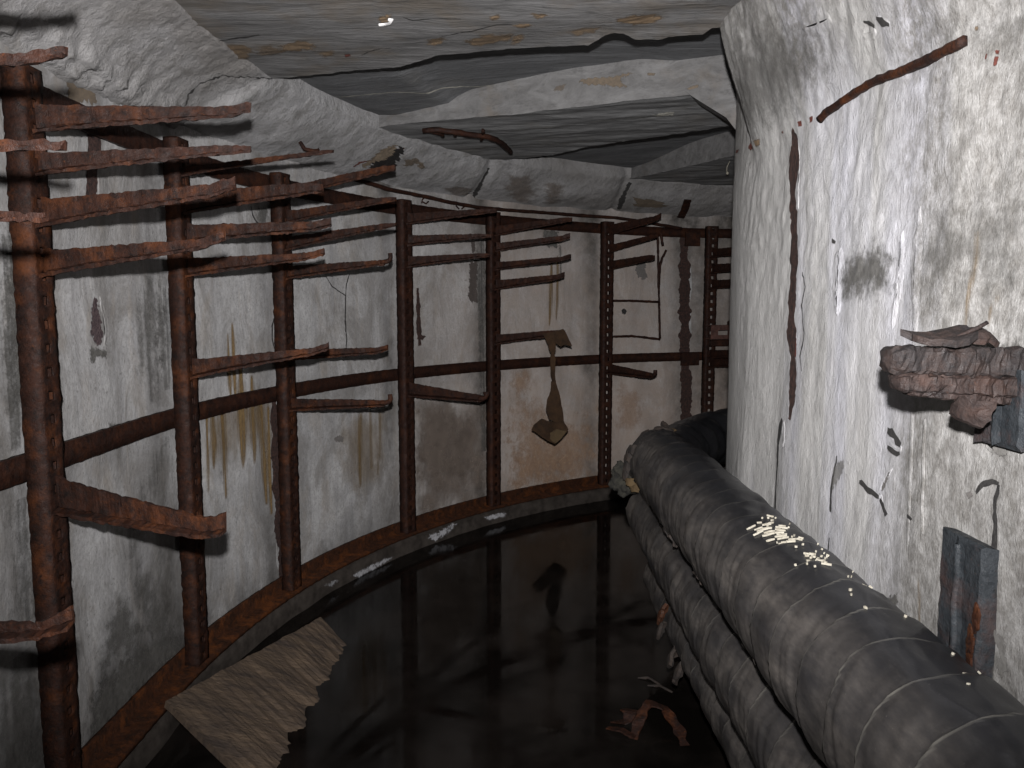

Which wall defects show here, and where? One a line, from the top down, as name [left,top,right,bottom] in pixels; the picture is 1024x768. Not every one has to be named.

crack [403,17,510,36]
rust [549,263,558,325]
damp [841,246,891,298]
rust [228,368,253,395]
rust [206,414,227,498]
rust [238,404,272,514]